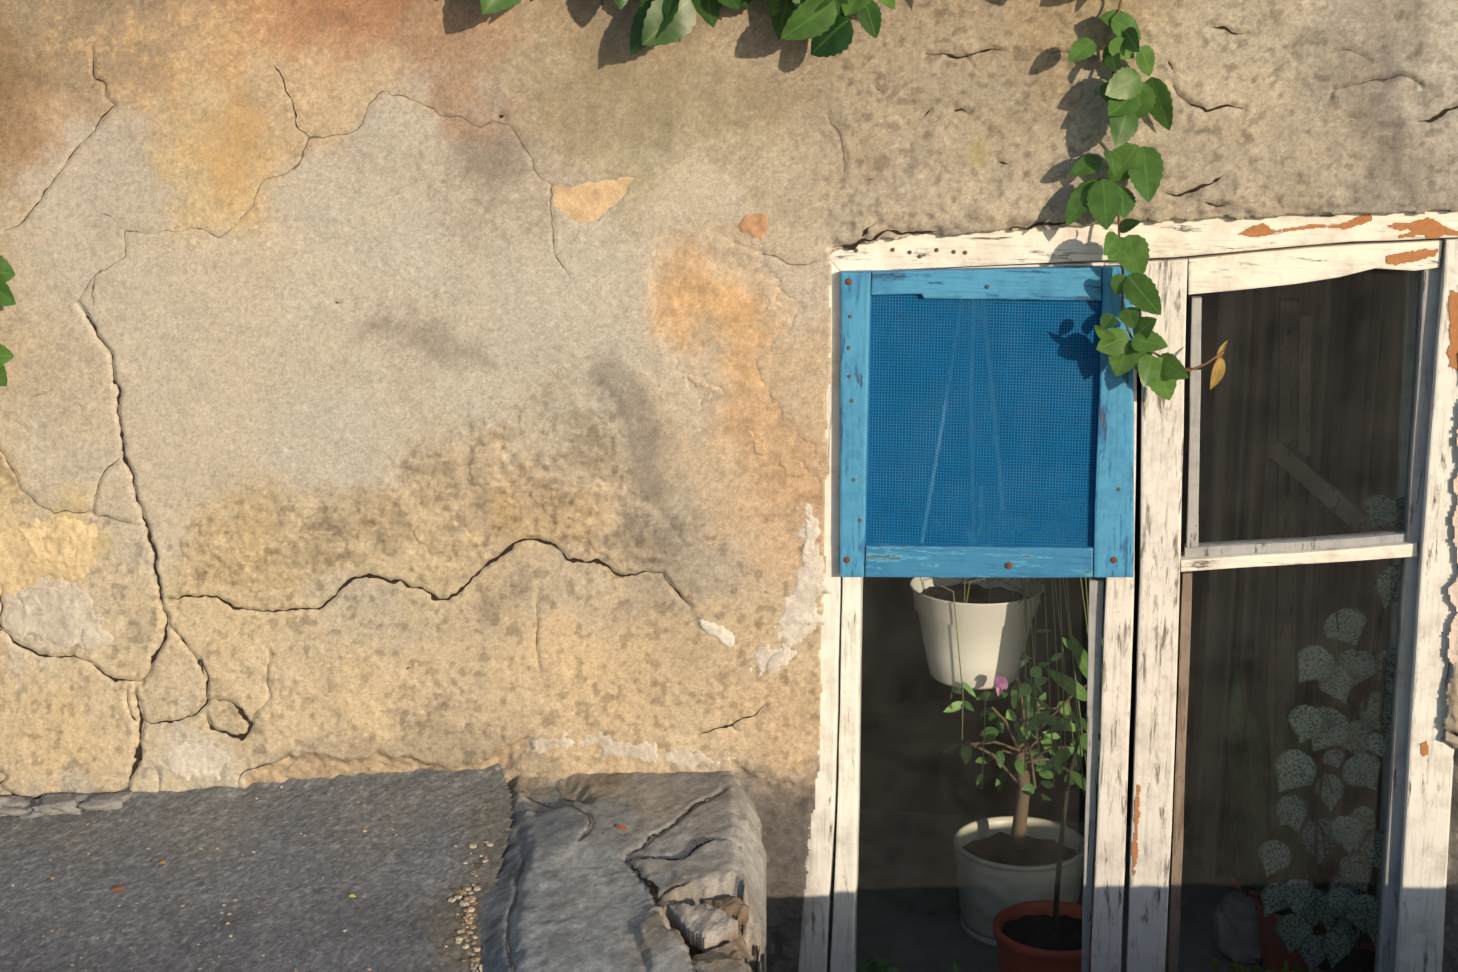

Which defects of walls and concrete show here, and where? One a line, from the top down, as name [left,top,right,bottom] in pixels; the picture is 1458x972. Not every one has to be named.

crack [926,48,1000,59]
crack [1169,62,1243,112]
crack [1423,106,1458,123]
crack [1160,175,1224,207]
peeling [1238,213,1458,266]
peeling [1447,290,1458,370]
crack [0,54,691,791]
spalling [646,213,831,677]
spalling [179,389,664,603]
spalling [1443,472,1458,733]
spalling [245,738,531,786]
crack [625,791,736,922]